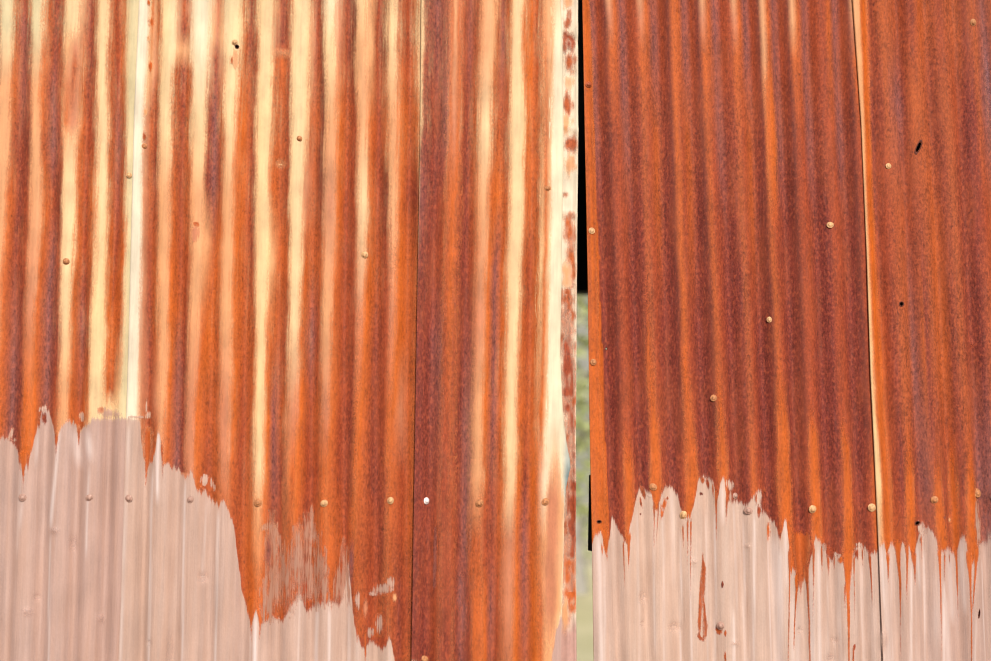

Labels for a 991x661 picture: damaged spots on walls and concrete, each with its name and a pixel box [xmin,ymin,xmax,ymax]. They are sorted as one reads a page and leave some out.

corrosion [0,0,128,481]
peeling [97,402,151,419]
peeling [259,507,397,638]
corrosion [138,0,608,661]
corrosion [644,298,668,543]
corrosion [682,366,729,641]
peeling [755,489,771,540]
corrosion [776,381,872,661]
peeling [823,542,865,563]
corrosion [860,0,922,625]
corrosion [933,452,979,661]
peeling [975,502,991,553]